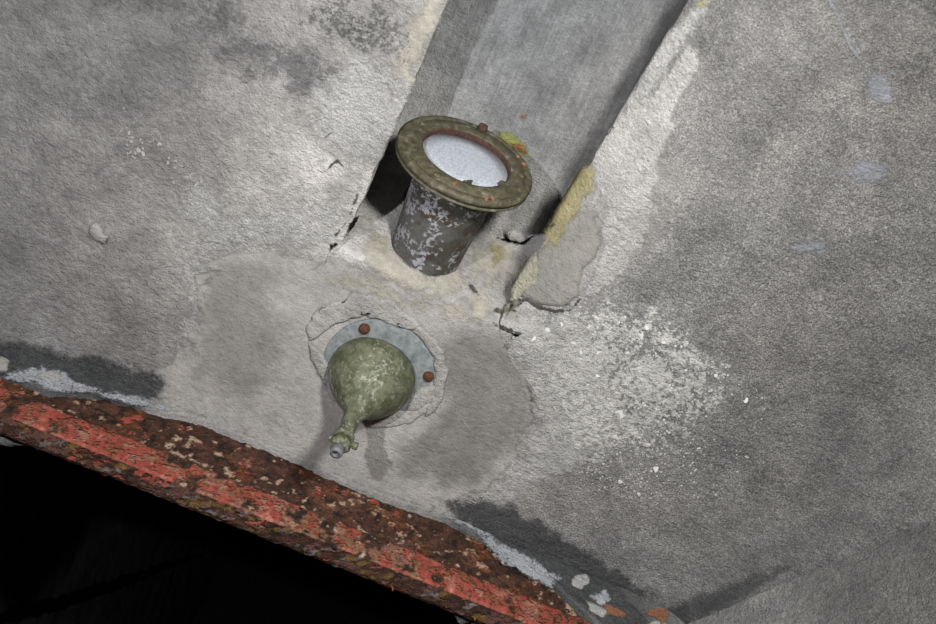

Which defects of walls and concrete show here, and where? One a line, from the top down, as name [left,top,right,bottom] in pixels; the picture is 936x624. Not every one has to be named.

crack [330,193,359,250]
water stain [332,0,711,624]
water stain [0,341,171,412]
rust [604,605,626,617]
rust [646,608,670,624]
water stain [670,576,766,624]